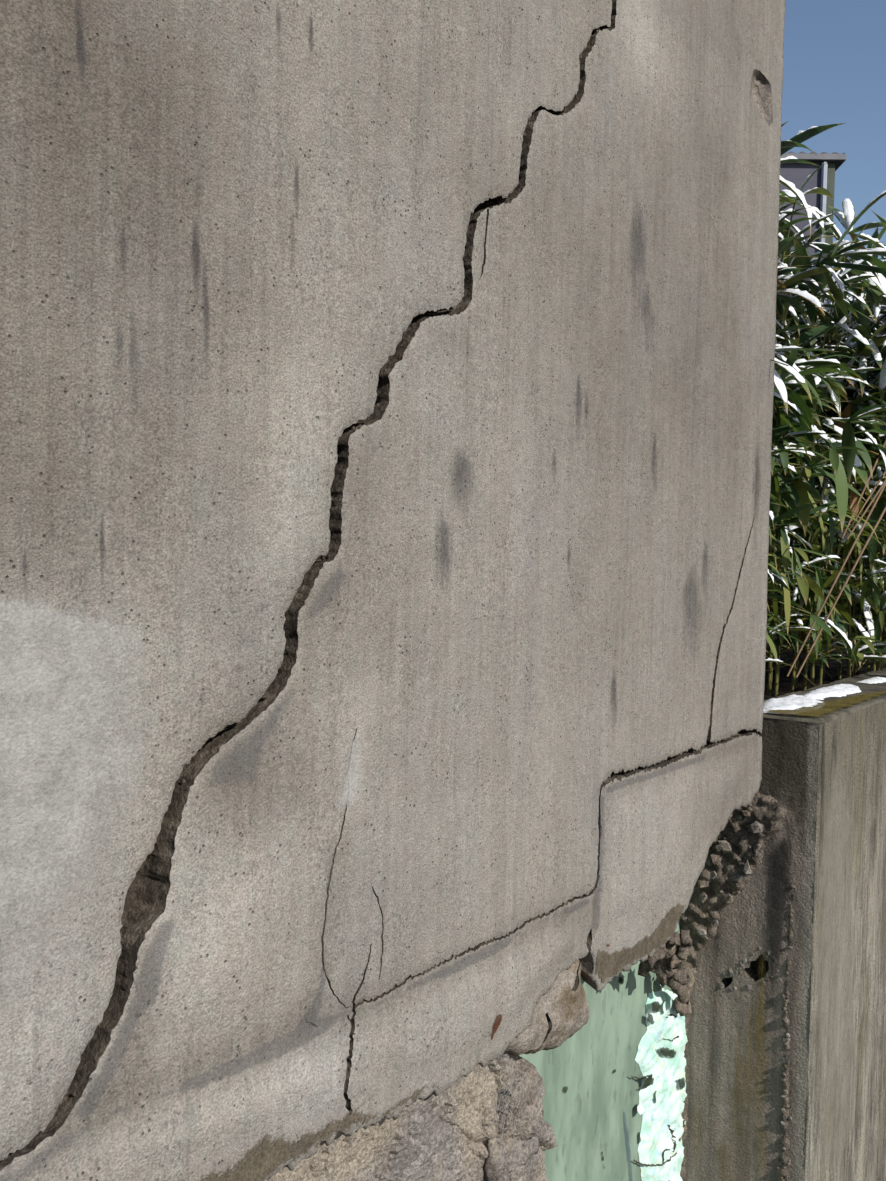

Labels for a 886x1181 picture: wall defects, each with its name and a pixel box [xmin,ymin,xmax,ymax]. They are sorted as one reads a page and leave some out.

spalling [750,69,773,126]
crack [0,0,617,1171]
crack [321,518,761,1116]
leakage [200,1085,439,1181]
spalling [264,959,590,1181]
spalling [631,793,796,1181]
leakage [732,838,792,1132]